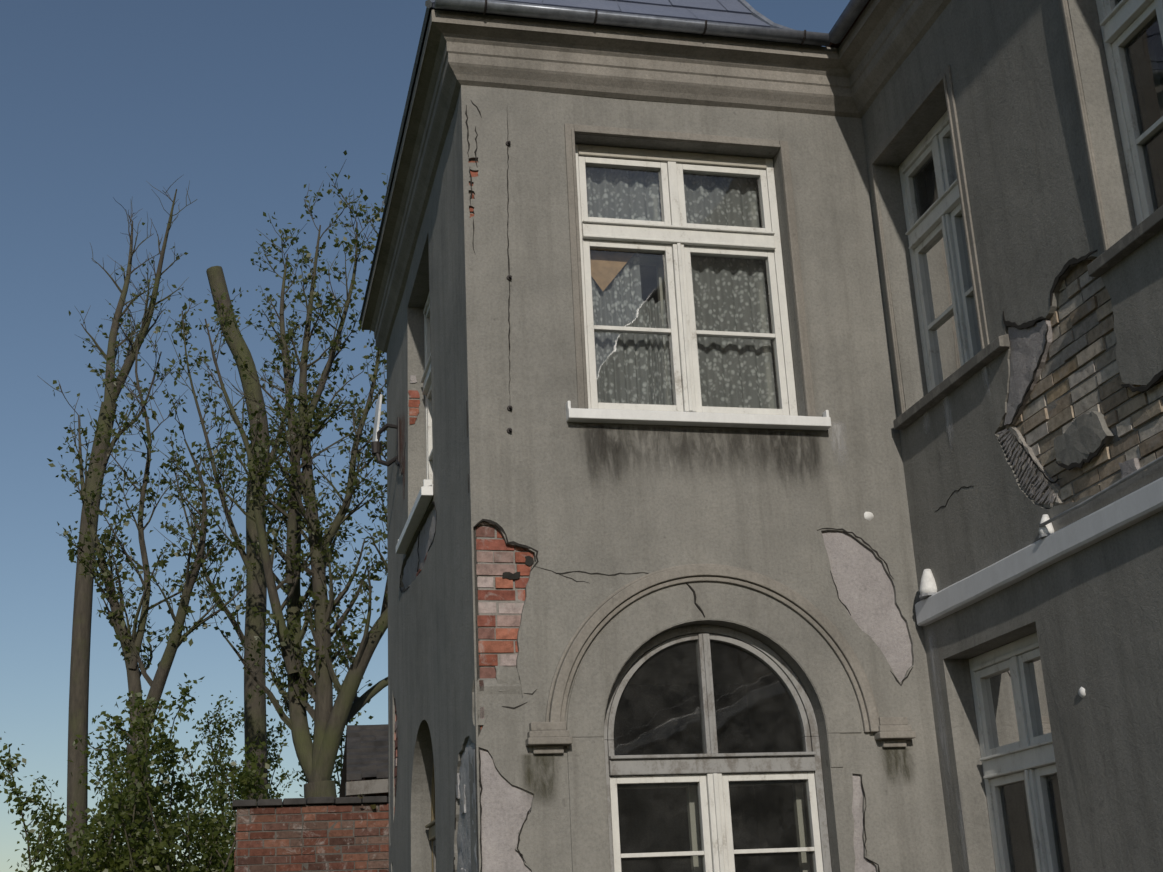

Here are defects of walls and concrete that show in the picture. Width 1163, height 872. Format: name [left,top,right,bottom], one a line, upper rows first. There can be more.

crack [465,101,510,394]
spalling [996,249,1163,508]
spalling [399,501,437,593]
spalling [474,519,539,709]
crack [535,566,649,583]
crack [686,582,705,617]
spalling [817,528,913,686]